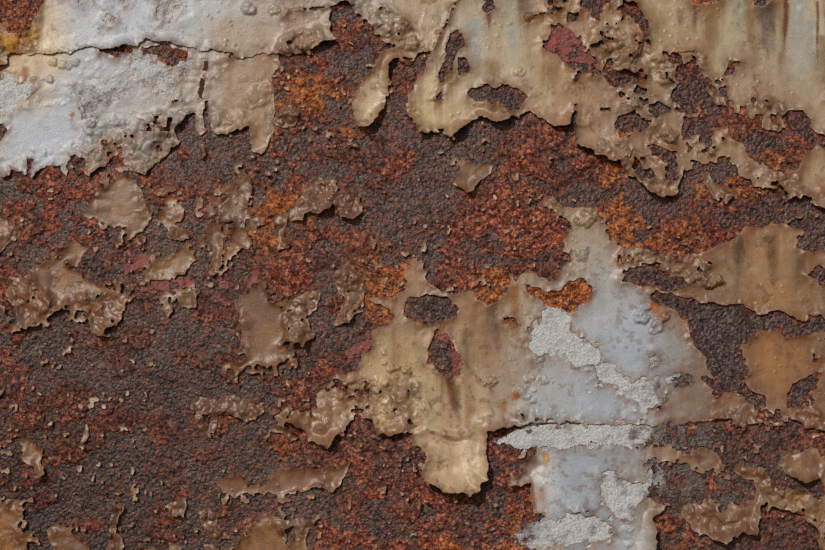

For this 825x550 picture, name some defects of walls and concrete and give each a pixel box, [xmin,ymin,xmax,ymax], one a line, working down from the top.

corrosion [268,73,353,157]
corrosion [0,162,128,260]
corrosion [248,193,338,247]
corrosion [357,248,411,298]
peeling [0,0,825,341]
corrosion [431,140,591,329]
corrosion [0,374,162,469]
peeling [190,395,265,438]
peeling [222,281,320,383]
peeling [261,197,825,550]
peeling [0,496,90,550]
peeling [166,498,186,517]